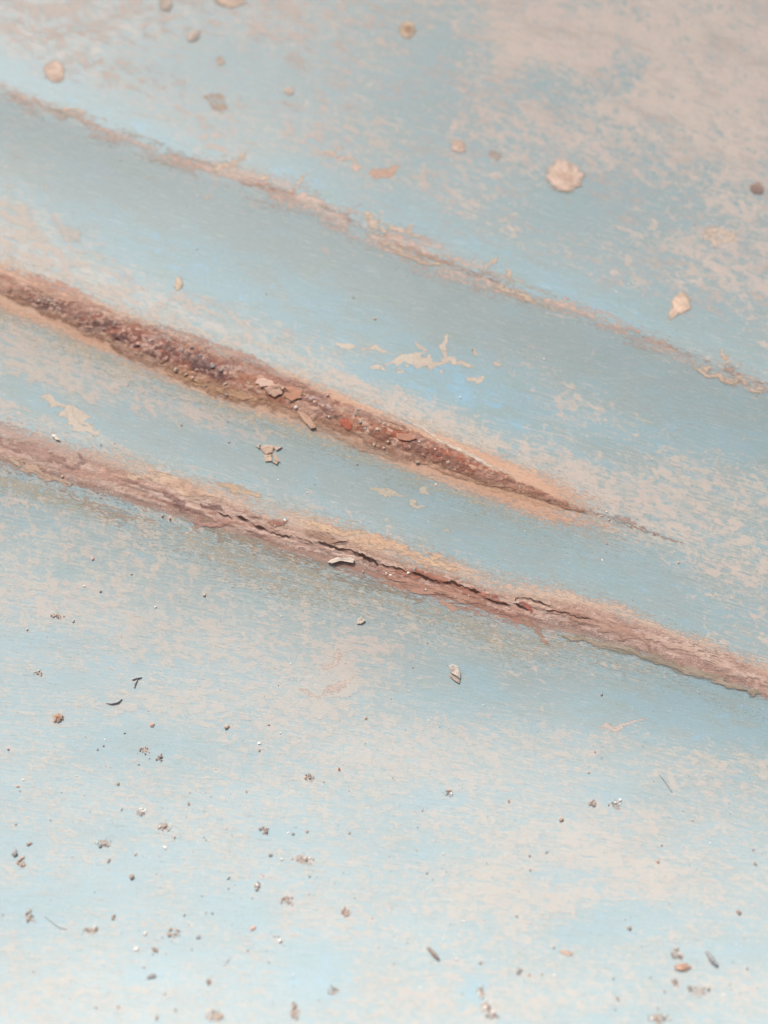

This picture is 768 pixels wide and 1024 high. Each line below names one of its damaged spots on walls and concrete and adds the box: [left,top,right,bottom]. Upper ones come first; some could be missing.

rust [0,252,683,558]
peeling [312,147,401,181]
rust [0,83,768,395]
peeling [335,334,485,385]
rust [0,420,768,704]
crack [217,511,592,620]